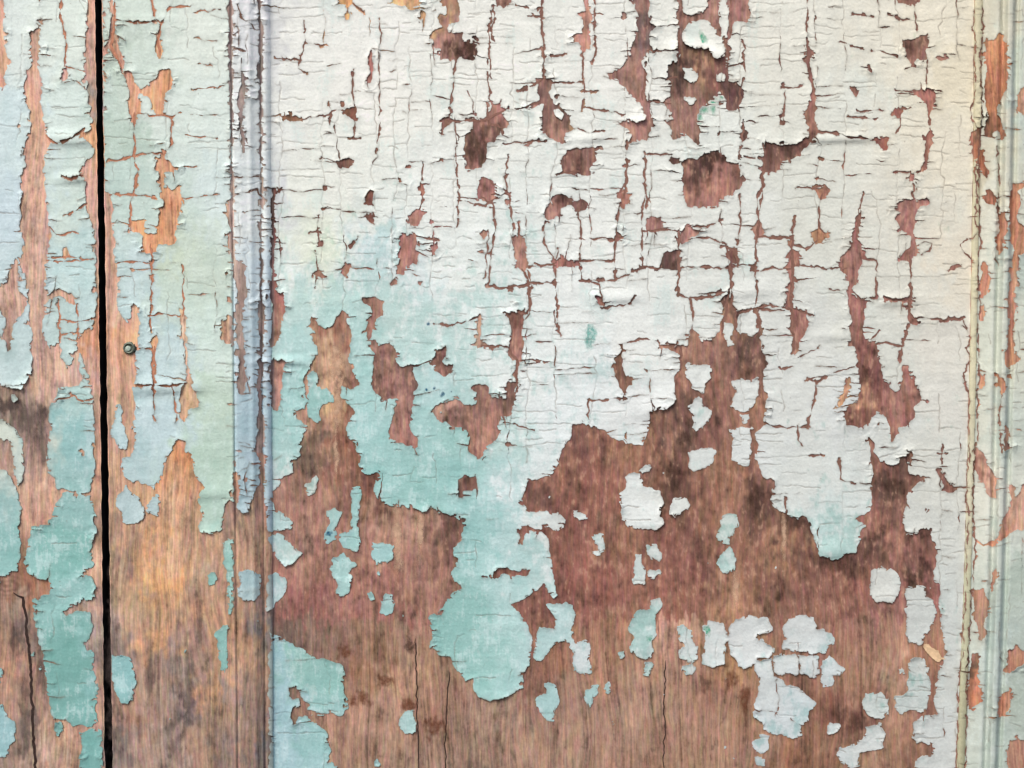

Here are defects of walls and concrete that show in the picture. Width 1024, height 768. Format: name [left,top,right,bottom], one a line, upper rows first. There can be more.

peeling [127,149,184,254]
peeling [220,0,250,395]
peeling [254,0,267,209]
crack [275,24,323,73]
crack [312,216,320,285]
crack [303,3,382,152]
peeling [969,33,1024,394]
peeling [0,0,175,768]
peeling [105,183,947,768]
crack [416,0,1003,768]
peeling [972,444,1024,547]
crack [13,592,37,768]